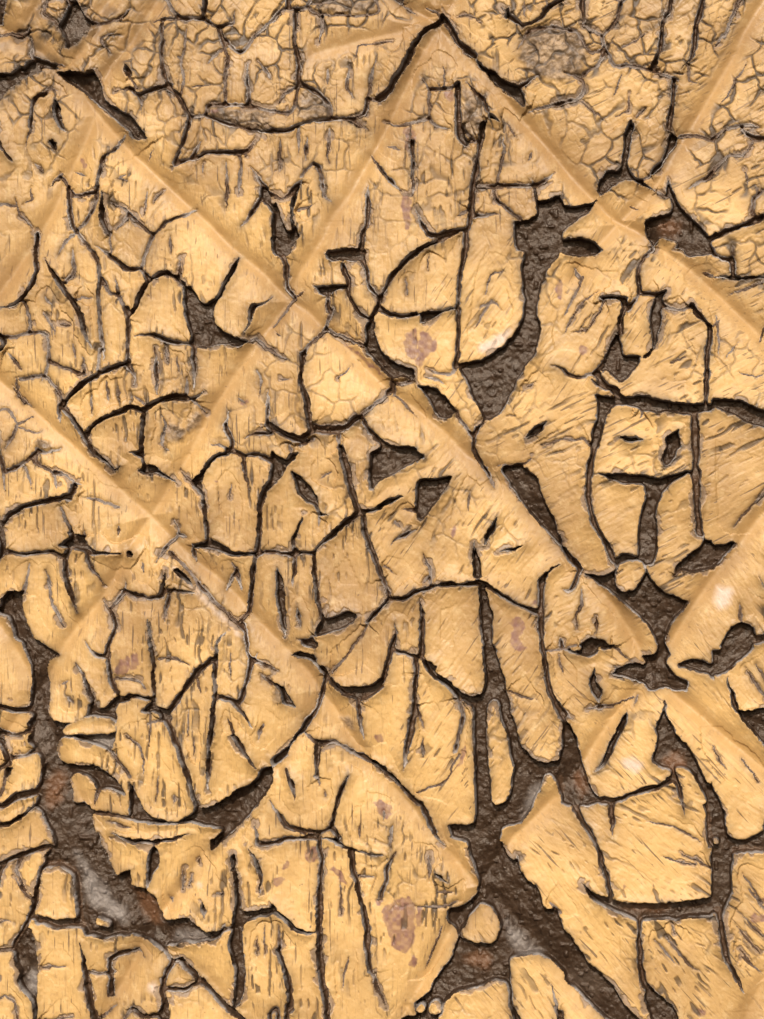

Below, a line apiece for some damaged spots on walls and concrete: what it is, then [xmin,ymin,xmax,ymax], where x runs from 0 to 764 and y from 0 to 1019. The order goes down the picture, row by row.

crack [93,0,482,226]
peeling [182,257,249,350]
peeling [302,0,764,692]
crack [564,246,764,538]
rust [652,213,686,241]
crack [0,66,644,1019]
rust [131,886,166,928]
peeling [0,446,764,1019]
rust [569,767,592,803]
rust [616,901,681,916]
crack [556,775,764,994]
crack [726,604,764,711]